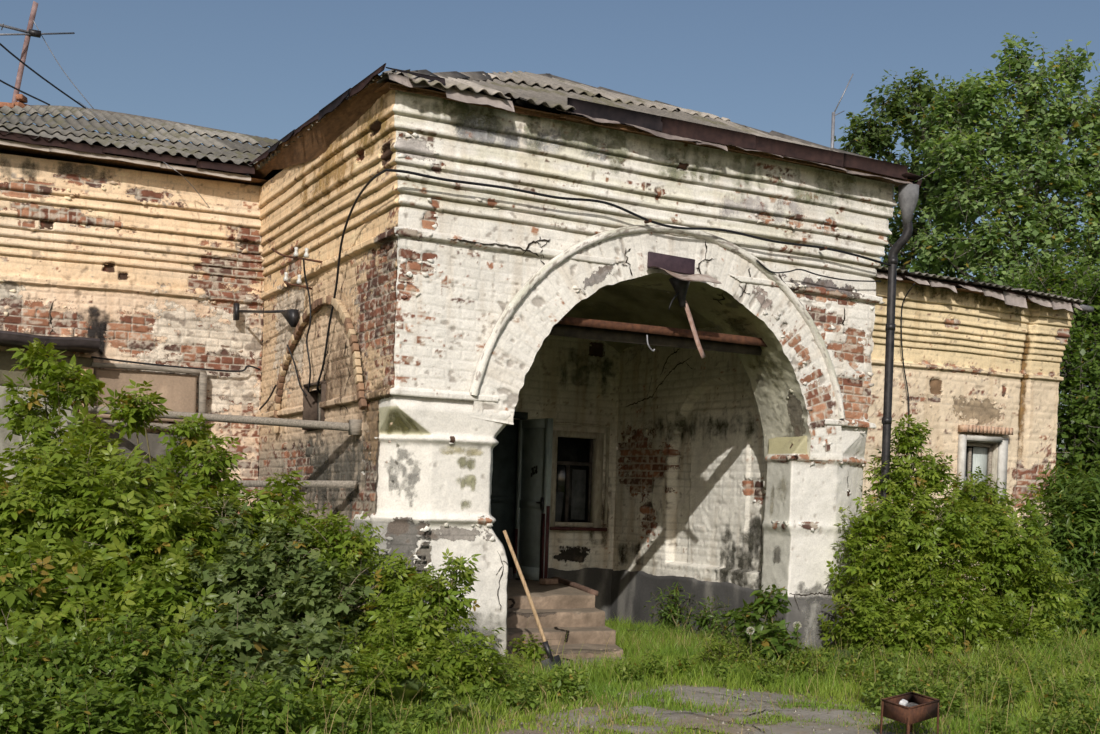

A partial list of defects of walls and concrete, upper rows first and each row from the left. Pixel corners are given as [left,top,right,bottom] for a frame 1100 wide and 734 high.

leakage [455,102,625,172]
flaking render [0,173,187,233]
crack [448,237,550,265]
peeling [0,223,310,426]
flaking render [354,196,443,474]
crack [625,348,692,407]
flaking render [750,273,885,467]
peeling [894,358,1057,425]
flaking render [1055,328,1070,345]
mould [388,449,420,506]
flaking render [617,423,681,548]
leakage [715,479,785,589]